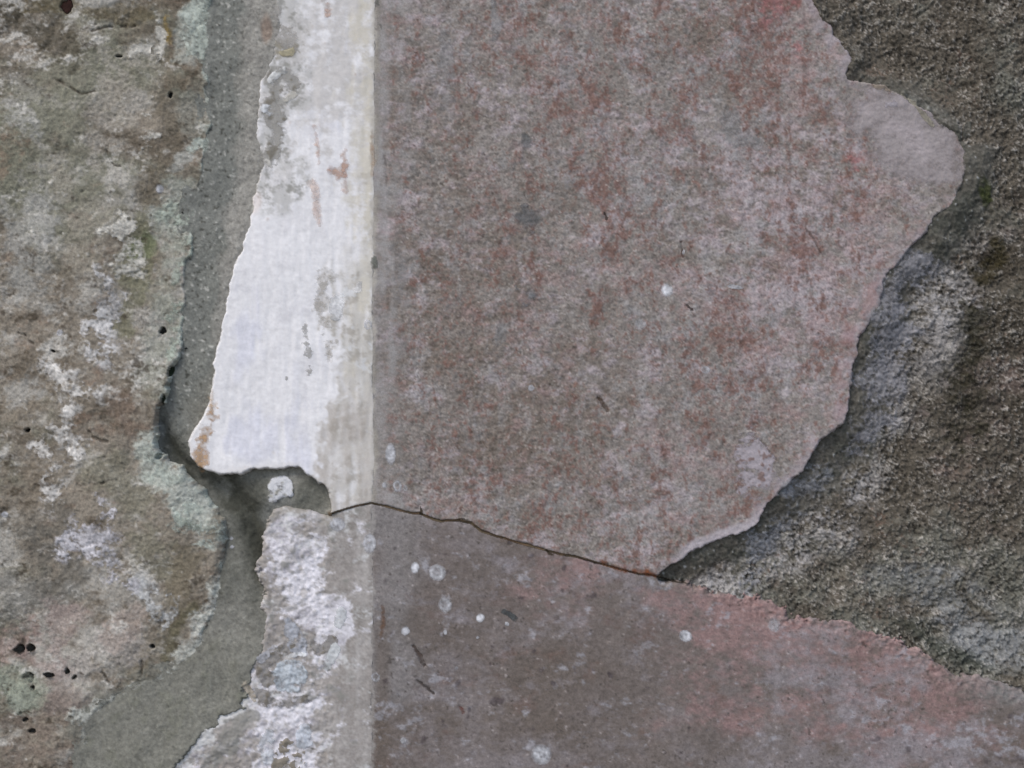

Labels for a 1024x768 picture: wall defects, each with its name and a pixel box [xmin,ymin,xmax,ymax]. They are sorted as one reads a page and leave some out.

rust [194,411,213,468]
spalling [68,0,347,768]
crack [330,502,688,584]
spalling [657,0,1024,691]